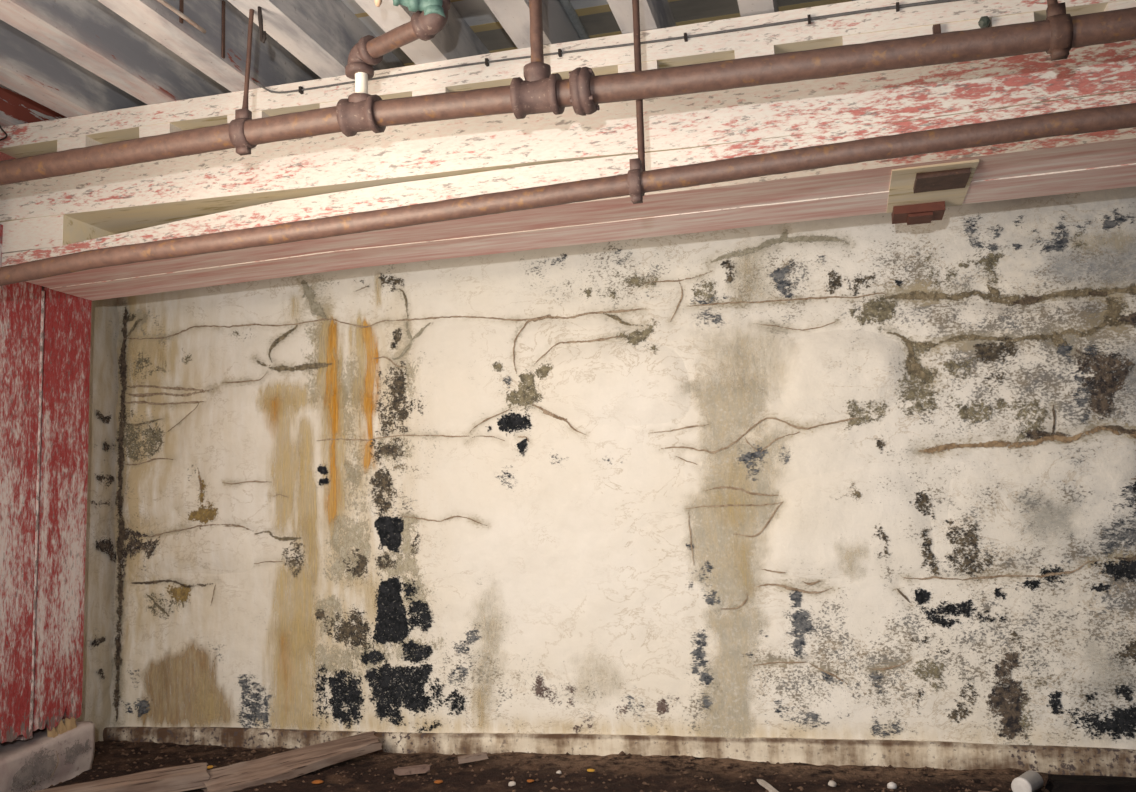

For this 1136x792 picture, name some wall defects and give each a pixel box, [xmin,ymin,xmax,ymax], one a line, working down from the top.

water stain [691,255,898,331]
water stain [917,207,1134,287]
water stain [844,334,1018,430]
water stain [1057,339,1136,426]
rust [260,317,379,581]
water stain [312,328,496,733]
crack [112,229,1136,719]
water stain [686,354,790,737]
water stain [909,490,996,581]
water stain [1090,478,1136,592]
water stain [783,591,816,657]
water stain [906,564,1136,745]